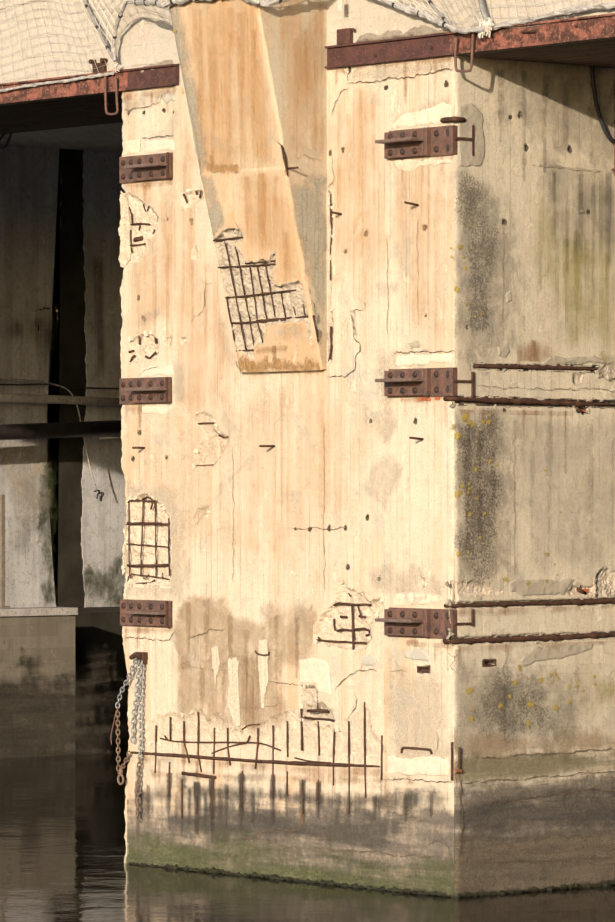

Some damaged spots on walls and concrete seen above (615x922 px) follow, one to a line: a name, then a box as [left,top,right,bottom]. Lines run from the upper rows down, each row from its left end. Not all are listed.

rust [204,155,239,173]
spalling [118,191,168,268]
spalling [211,188,335,366]
crack [331,301,365,377]
leakage [463,432,496,550]
spalling [121,493,172,587]
leakage [211,646,240,727]
leakage [252,639,269,714]
rust [131,724,380,774]
spalling [142,684,386,819]
leakage [127,773,615,898]
crack [239,748,615,892]